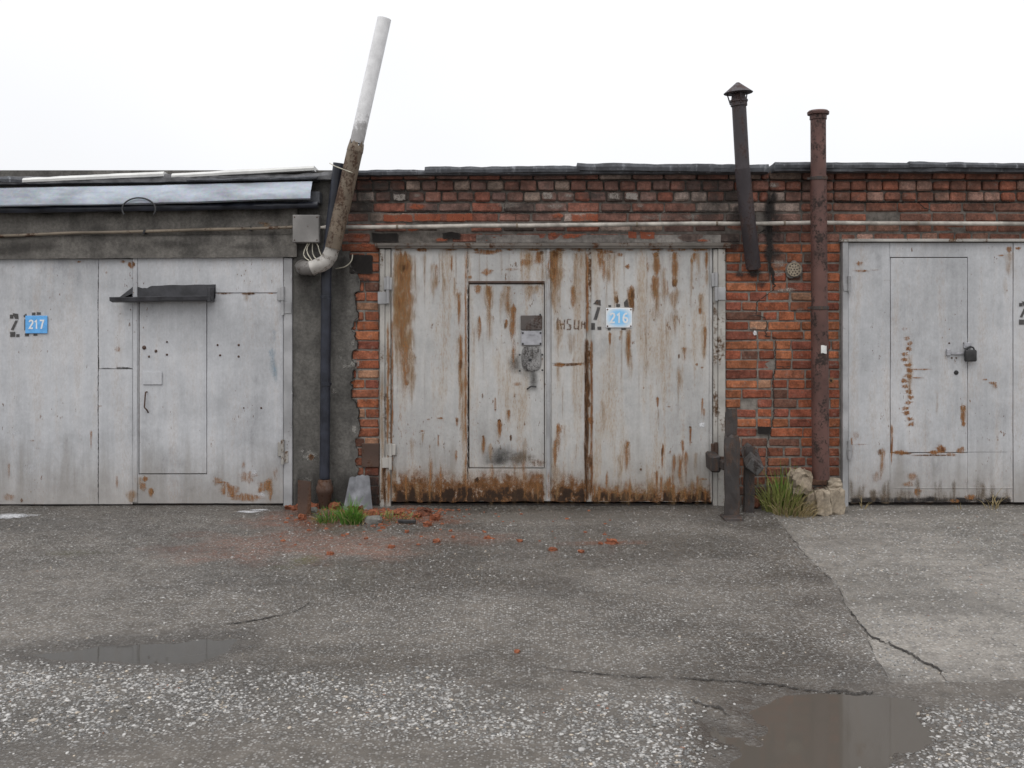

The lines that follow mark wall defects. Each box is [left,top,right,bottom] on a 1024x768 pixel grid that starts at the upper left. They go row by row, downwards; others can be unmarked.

rust [381,248,710,504]
rust [901,337,927,426]
rust [215,463,275,501]
rust [875,427,964,475]